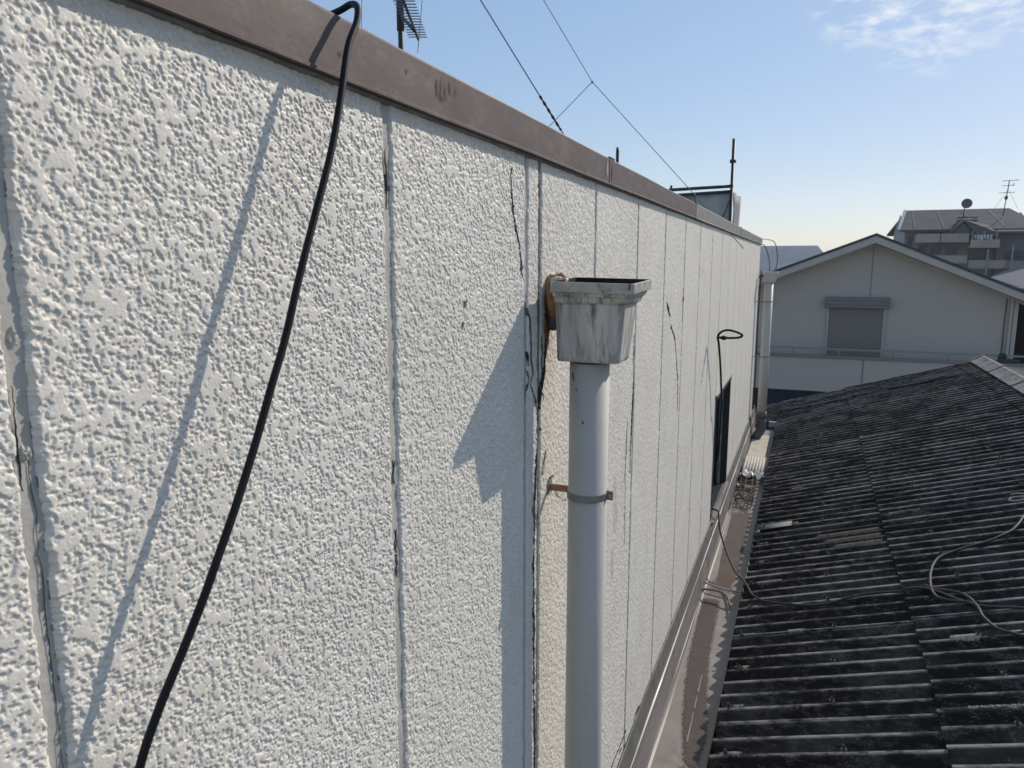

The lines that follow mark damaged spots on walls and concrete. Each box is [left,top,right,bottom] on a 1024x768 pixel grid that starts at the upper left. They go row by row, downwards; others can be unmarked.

crack [11,386,64,768]
crack [511,168,567,768]